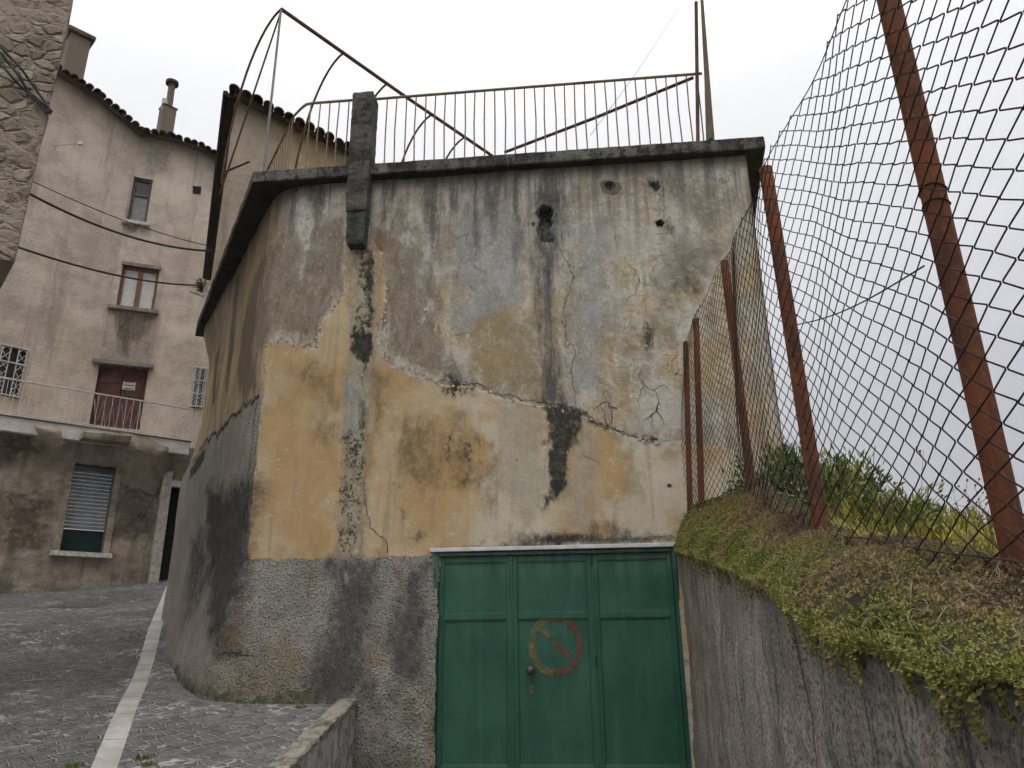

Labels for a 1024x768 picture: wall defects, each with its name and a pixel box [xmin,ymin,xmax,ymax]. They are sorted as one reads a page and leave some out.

leakage [310,229,387,701]
peeling [373,200,474,389]
spalling [531,207,558,243]
crack [442,247,685,444]
leakage [544,366,588,504]
spalling [597,178,625,199]
leakage [187,479,262,658]